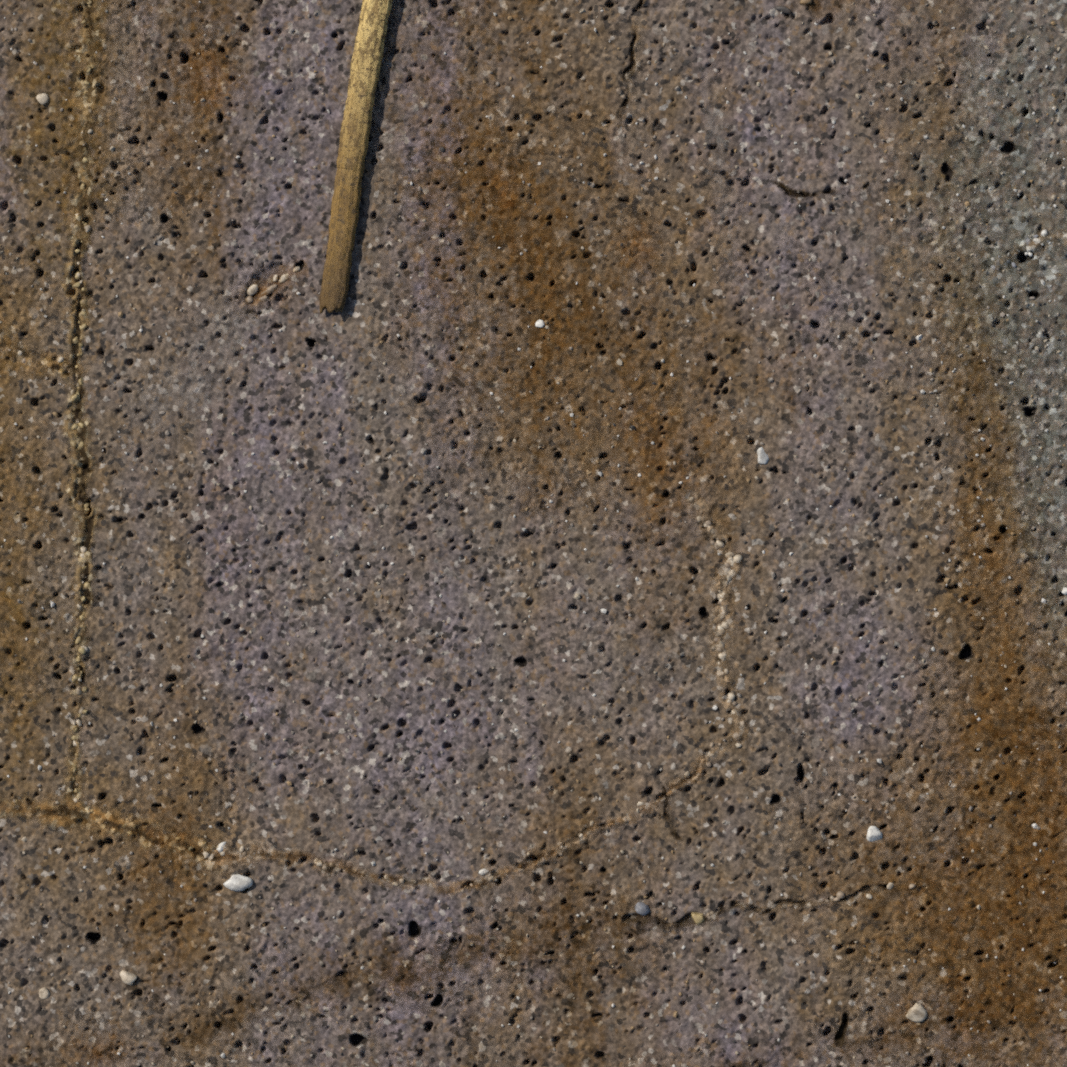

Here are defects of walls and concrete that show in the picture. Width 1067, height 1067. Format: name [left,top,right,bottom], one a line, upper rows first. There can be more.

crack [0,0,748,893]